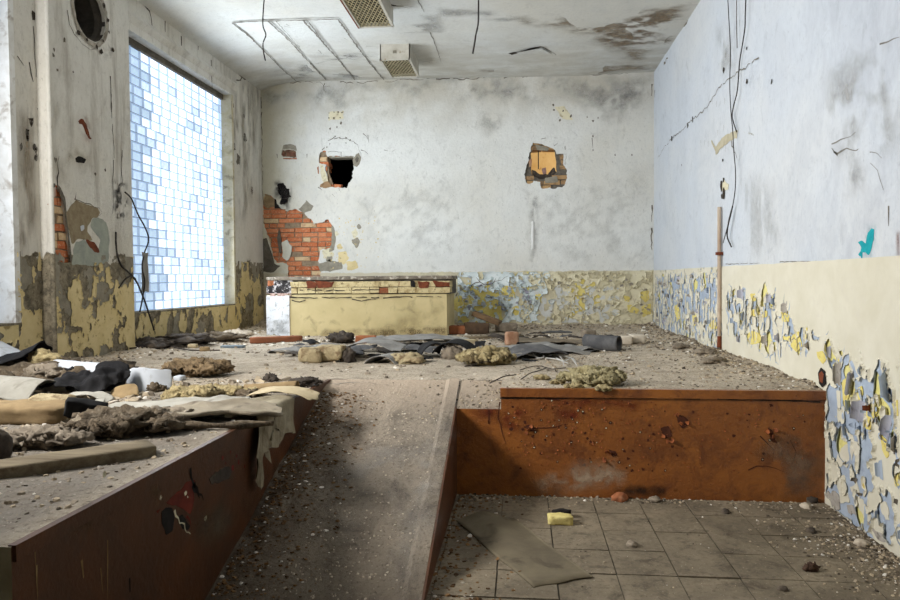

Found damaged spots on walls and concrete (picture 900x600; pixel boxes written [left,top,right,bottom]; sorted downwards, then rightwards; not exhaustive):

water stain [558,9,677,73]
crack [661,57,759,152]
spalling [317,143,361,188]
spalling [524,143,567,189]
peeling [0,251,43,350]
peeling [47,183,379,358]
peeling [410,256,900,559]